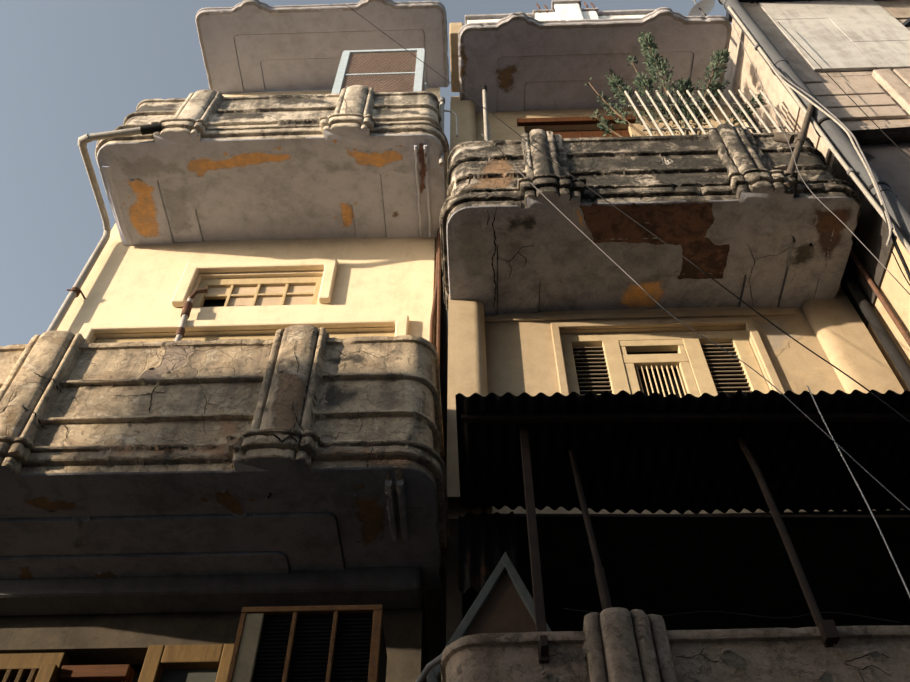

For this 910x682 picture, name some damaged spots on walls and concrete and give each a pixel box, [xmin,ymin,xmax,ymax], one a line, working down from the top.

peeling [491,60,520,95]
peeling [185,146,294,181]
peeling [331,139,405,178]
peeling [120,178,166,241]
crack [454,149,529,310]
spalling [572,202,733,309]
crack [115,386,166,414]
crack [844,651,891,682]